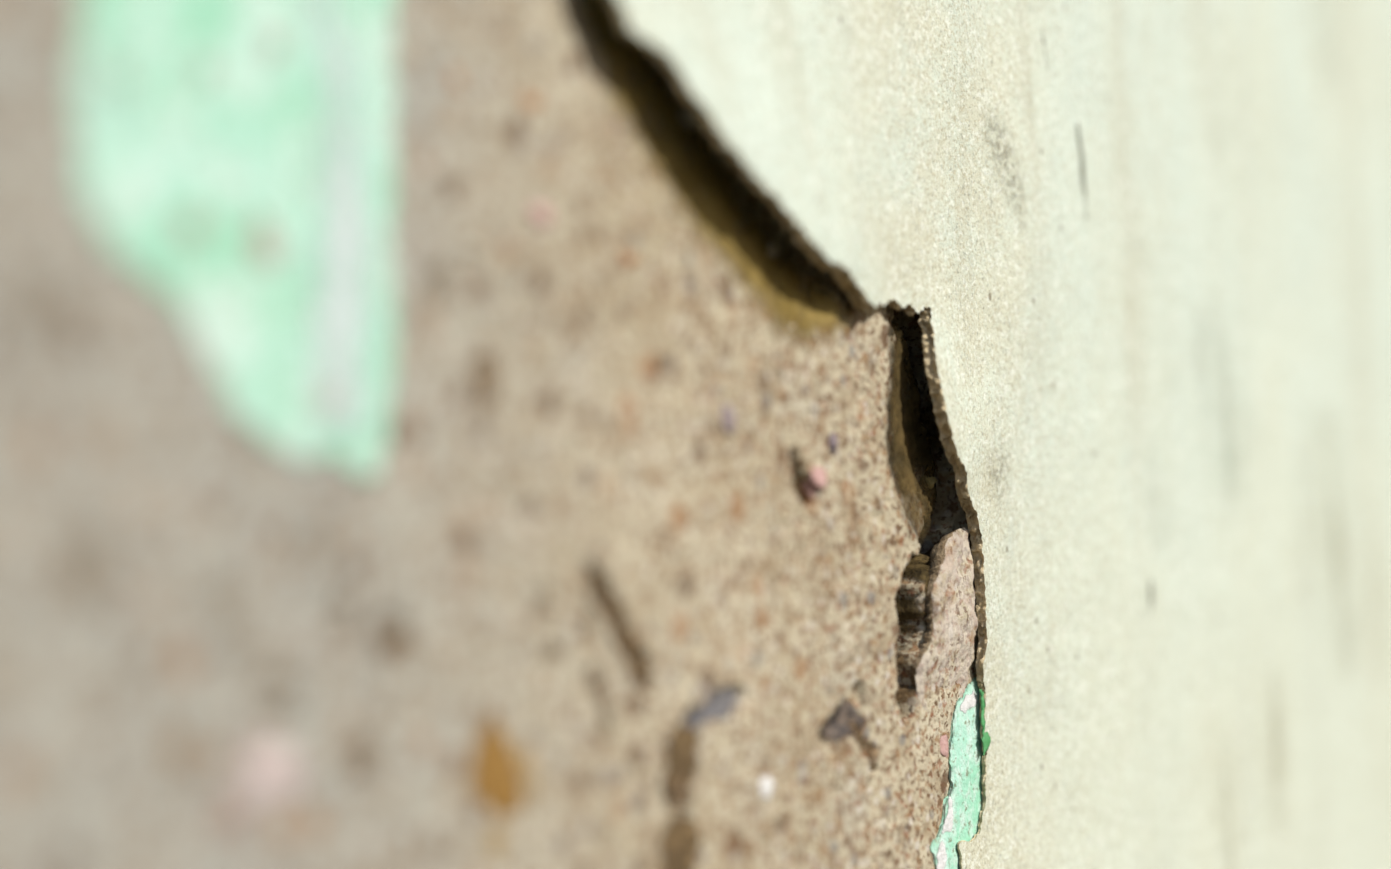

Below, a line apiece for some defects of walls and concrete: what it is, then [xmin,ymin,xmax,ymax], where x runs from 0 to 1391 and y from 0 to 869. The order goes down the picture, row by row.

peeling [72,0,397,480]
spalling [584,574,652,689]
peeling [606,0,1023,869]
crack [895,553,930,702]